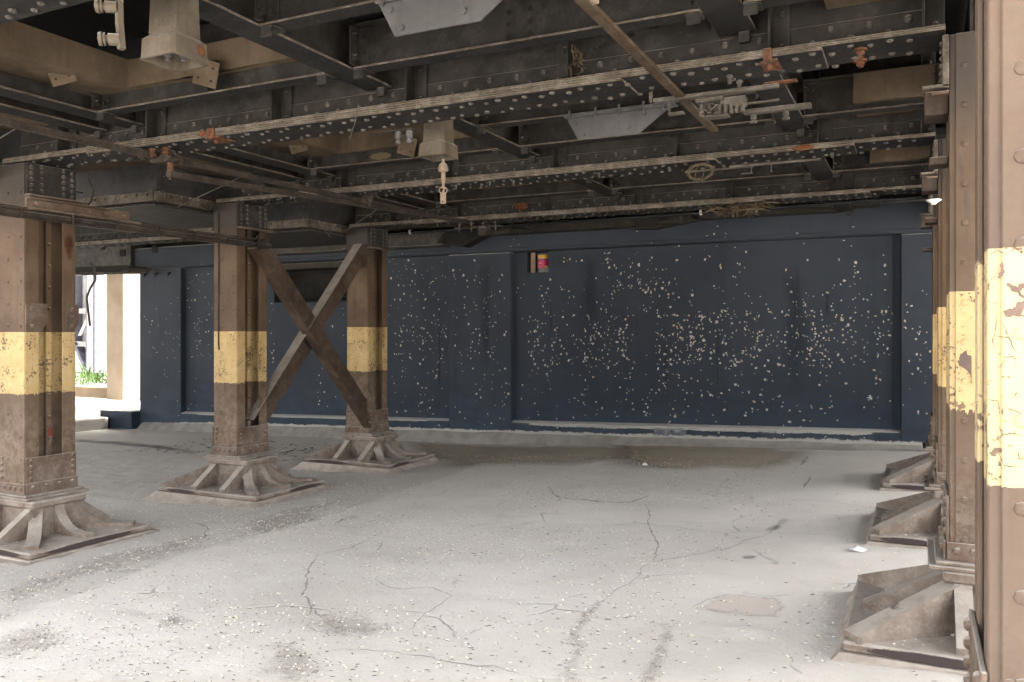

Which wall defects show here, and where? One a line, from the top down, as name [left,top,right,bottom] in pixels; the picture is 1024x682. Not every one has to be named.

peeling [271,375,346,419]
peeling [388,259,525,426]
peeling [522,243,931,439]
peeling [959,351,972,383]
crack [553,600,614,682]
crack [630,620,683,682]